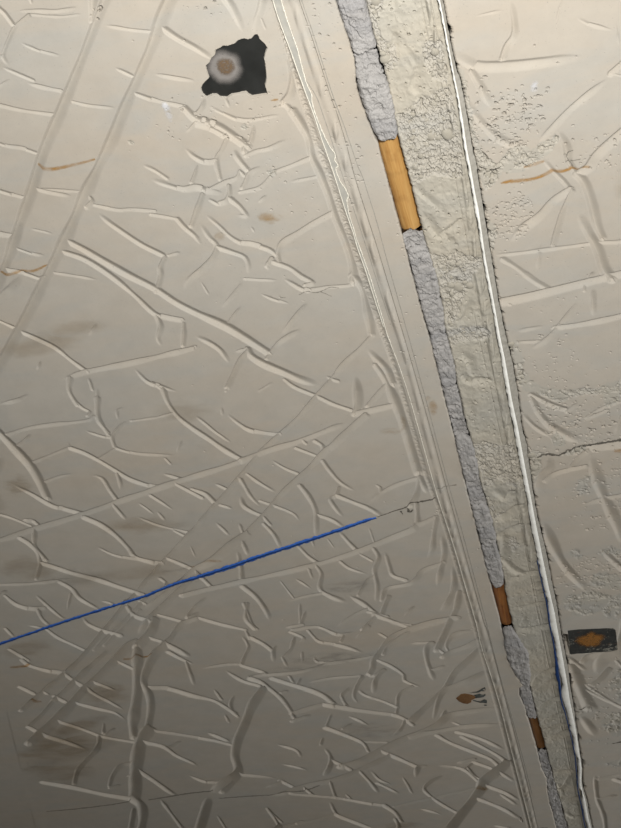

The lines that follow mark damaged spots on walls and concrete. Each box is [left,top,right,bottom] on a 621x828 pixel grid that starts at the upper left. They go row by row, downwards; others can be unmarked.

crack [538,439,621,458]
crack [378,484,456,517]
rust [577,633,603,646]
rust [456,687,487,706]
crack [47,785,320,812]